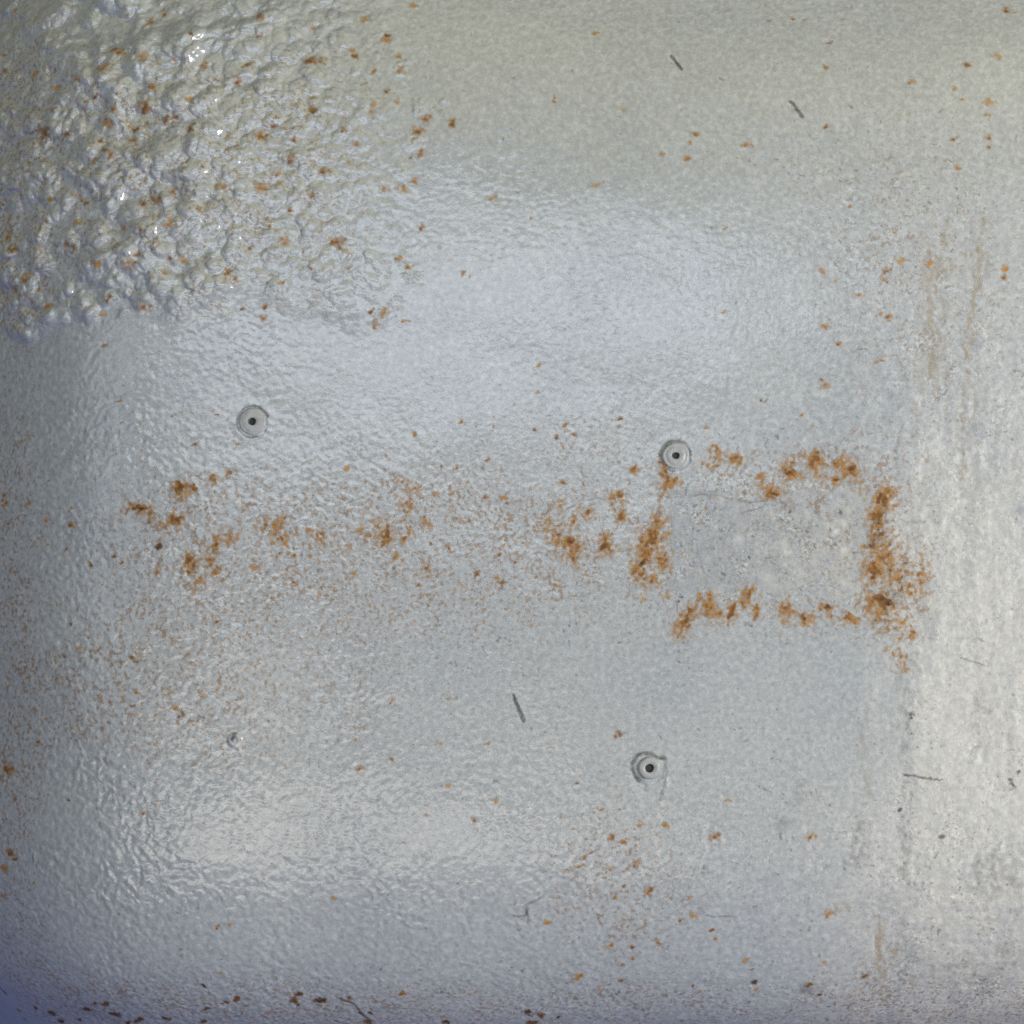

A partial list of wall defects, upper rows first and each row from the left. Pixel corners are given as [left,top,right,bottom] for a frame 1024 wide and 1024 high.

rust [702,444,743,468]
rust [756,451,858,499]
rust [126,480,198,530]
rust [181,533,239,594]
rust [261,517,296,557]
rust [358,480,432,561]
rust [545,509,590,563]
rust [600,532,614,555]
rust [609,491,625,521]
rust [630,461,683,601]
rust [779,486,930,669]
rust [674,585,760,639]